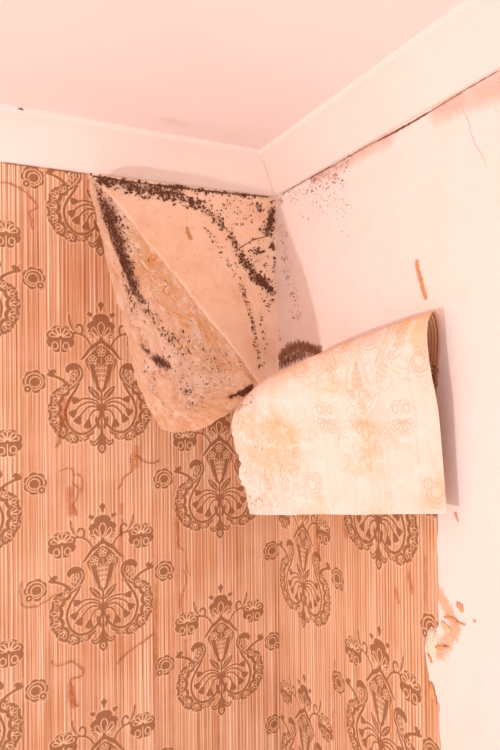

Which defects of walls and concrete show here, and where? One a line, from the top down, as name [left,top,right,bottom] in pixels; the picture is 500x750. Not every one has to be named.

crack [6,71,498,197]
leakage [87,155,352,416]